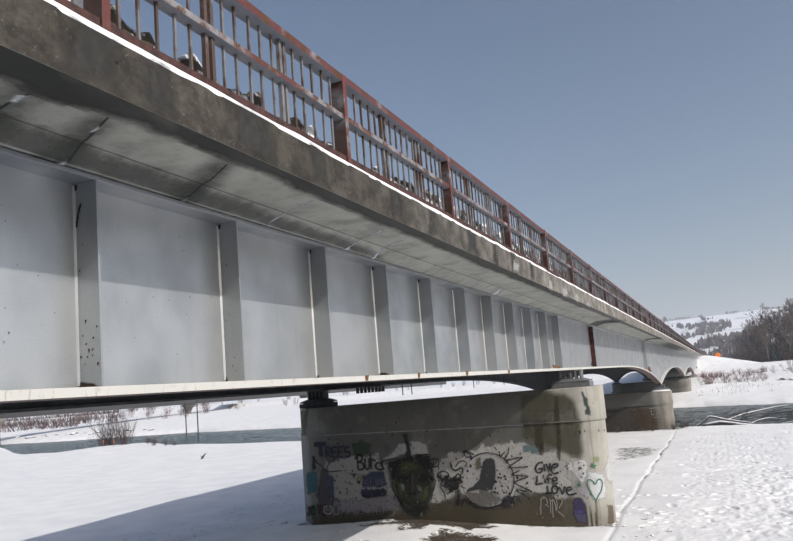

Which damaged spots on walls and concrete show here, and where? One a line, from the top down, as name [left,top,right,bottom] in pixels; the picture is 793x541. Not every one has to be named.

leakage [301,392,590,458]
leakage [313,494,598,527]